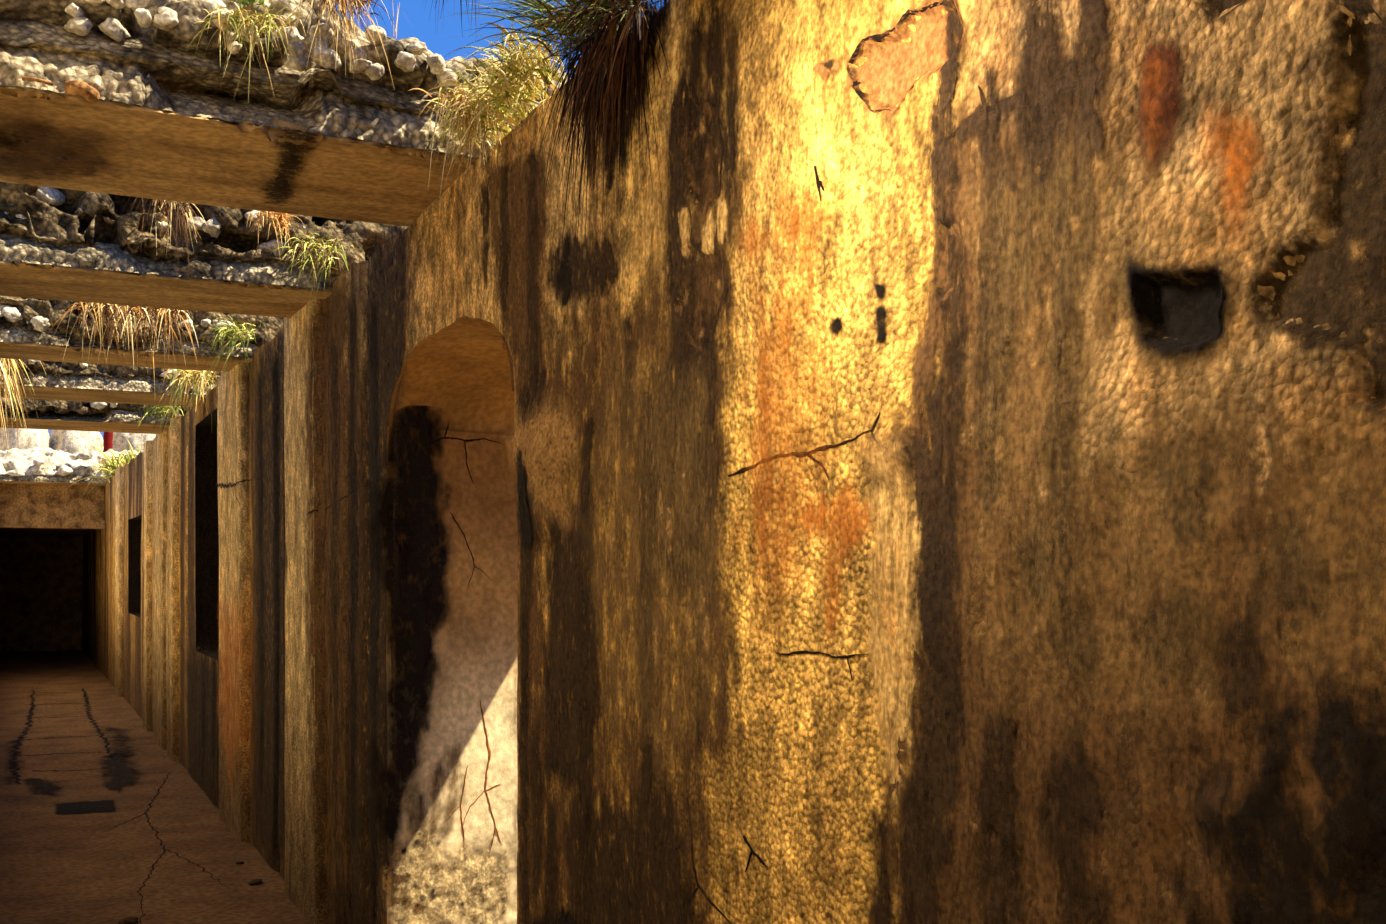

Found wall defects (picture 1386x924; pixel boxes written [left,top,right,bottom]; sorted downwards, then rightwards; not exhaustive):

spalling [814,0,964,115]
rust [1140,45,1178,184]
spalling [1116,0,1386,420]
damp [479,0,743,924]
crack [728,412,930,480]
damp [868,0,1386,924]
crack [7,688,230,924]
damp [101,727,141,790]
damp [410,750,464,844]